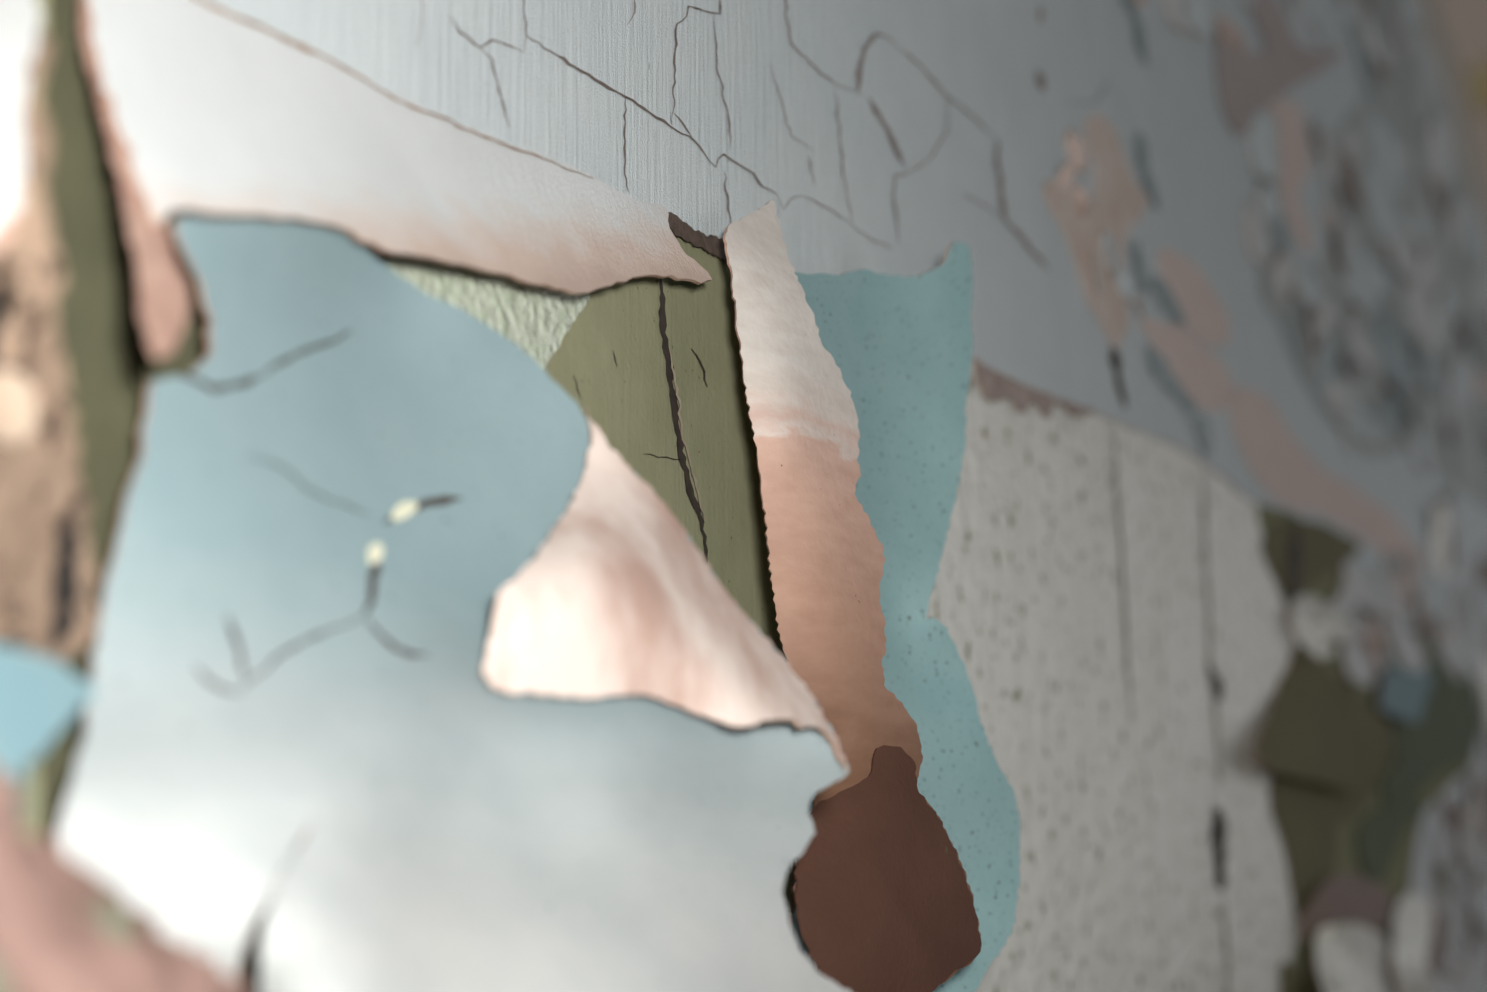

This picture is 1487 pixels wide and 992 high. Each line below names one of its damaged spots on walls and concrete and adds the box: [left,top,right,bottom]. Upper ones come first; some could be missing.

crack [197,0,1049,270]
crack [180,330,353,392]
crack [193,456,462,694]
peeling [0,0,1021,992]
peeling [1090,229,1235,412]
peeling [1254,0,1487,992]